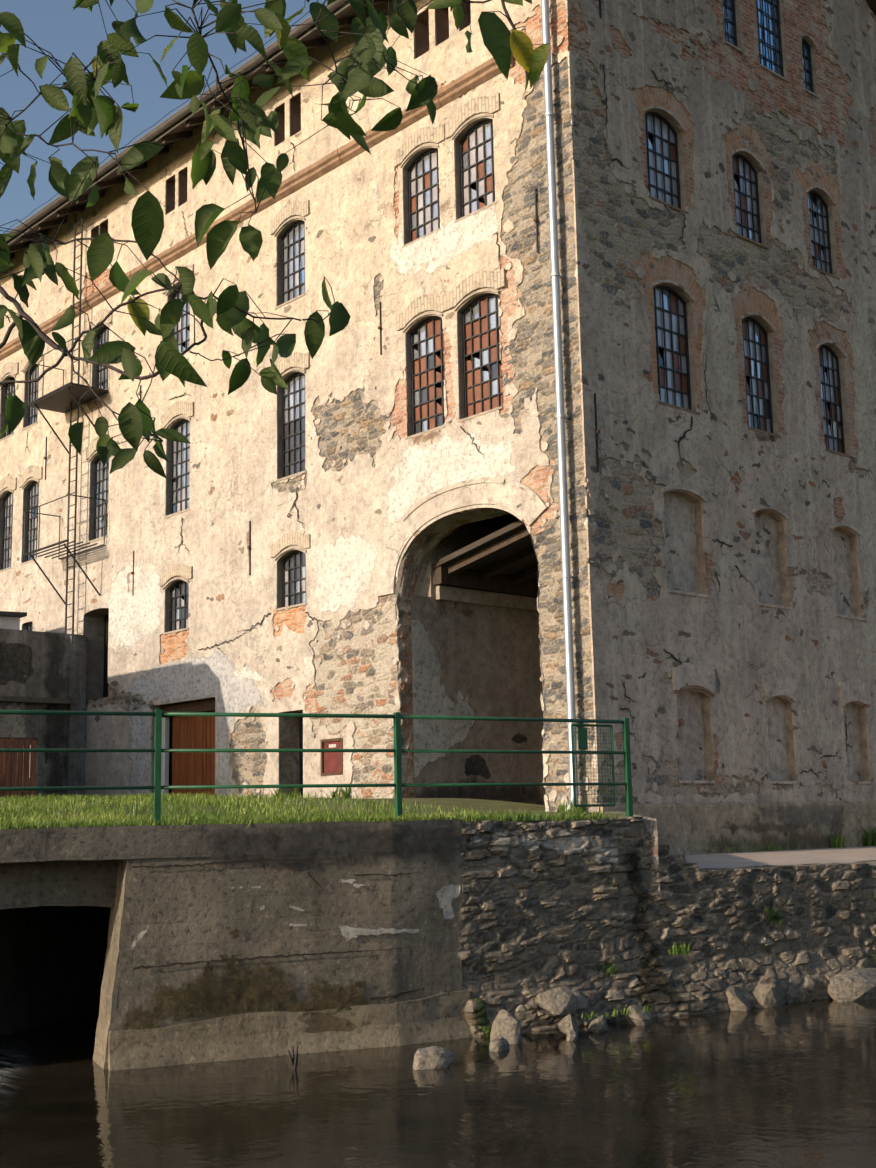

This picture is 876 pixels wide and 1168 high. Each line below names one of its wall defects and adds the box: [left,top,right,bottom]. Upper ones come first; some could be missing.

spalling [311,0,876,813]
spalling [271,470,308,493]
crack [198,613,271,651]
spalling [86,533,475,799]
damp [0,702,28,738]
damp [43,634,68,796]
damp [207,828,460,869]
damp [339,926,419,940]
damp [436,884,460,919]
damp [474,828,681,1009]
damp [305,1013,357,1033]